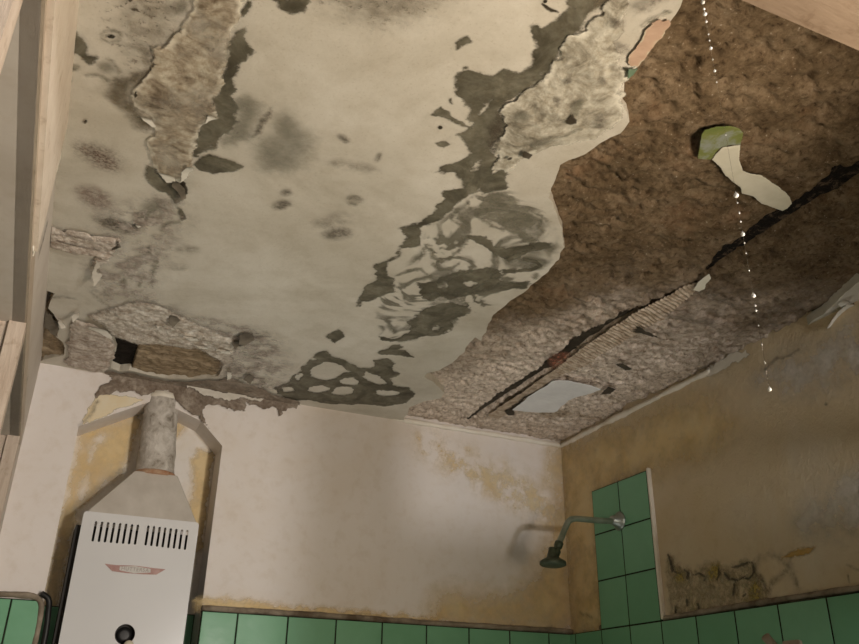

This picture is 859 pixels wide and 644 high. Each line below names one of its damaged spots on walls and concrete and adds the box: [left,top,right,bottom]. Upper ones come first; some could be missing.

water stain [73,0,184,128]
peeling [132,0,251,200]
water stain [193,29,270,174]
peeling [50,227,122,287]
water stain [101,166,188,232]
water stain [274,0,609,407]
spalling [407,0,859,441]
peeling [41,291,287,402]
peeling [667,554,767,614]